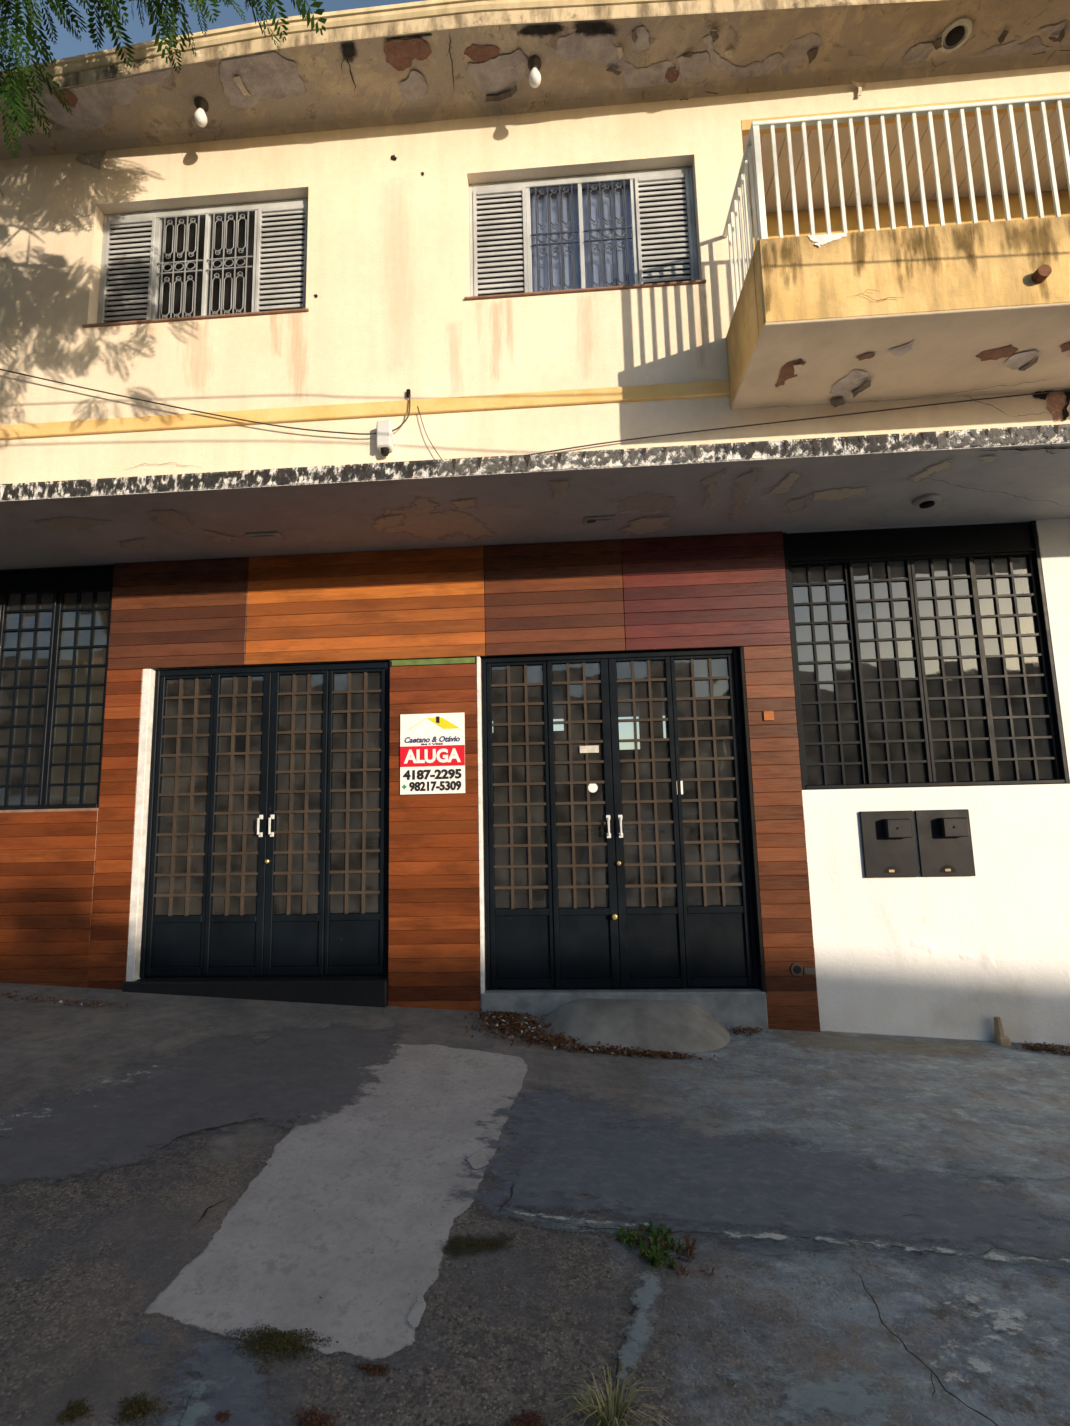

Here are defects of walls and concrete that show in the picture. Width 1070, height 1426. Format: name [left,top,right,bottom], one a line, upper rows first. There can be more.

flaking render [464,44,528,102]
peeling [555,27,823,100]
water stain [852,232,866,272]
water stain [894,229,940,275]
water stain [955,224,984,269]
water stain [1006,220,1058,298]
peeling [775,359,806,387]
peeling [830,341,914,408]
peeling [976,345,1038,371]
spalling [1033,389,1070,421]
water stain [0,424,1070,499]
crack [495,1182,1070,1426]